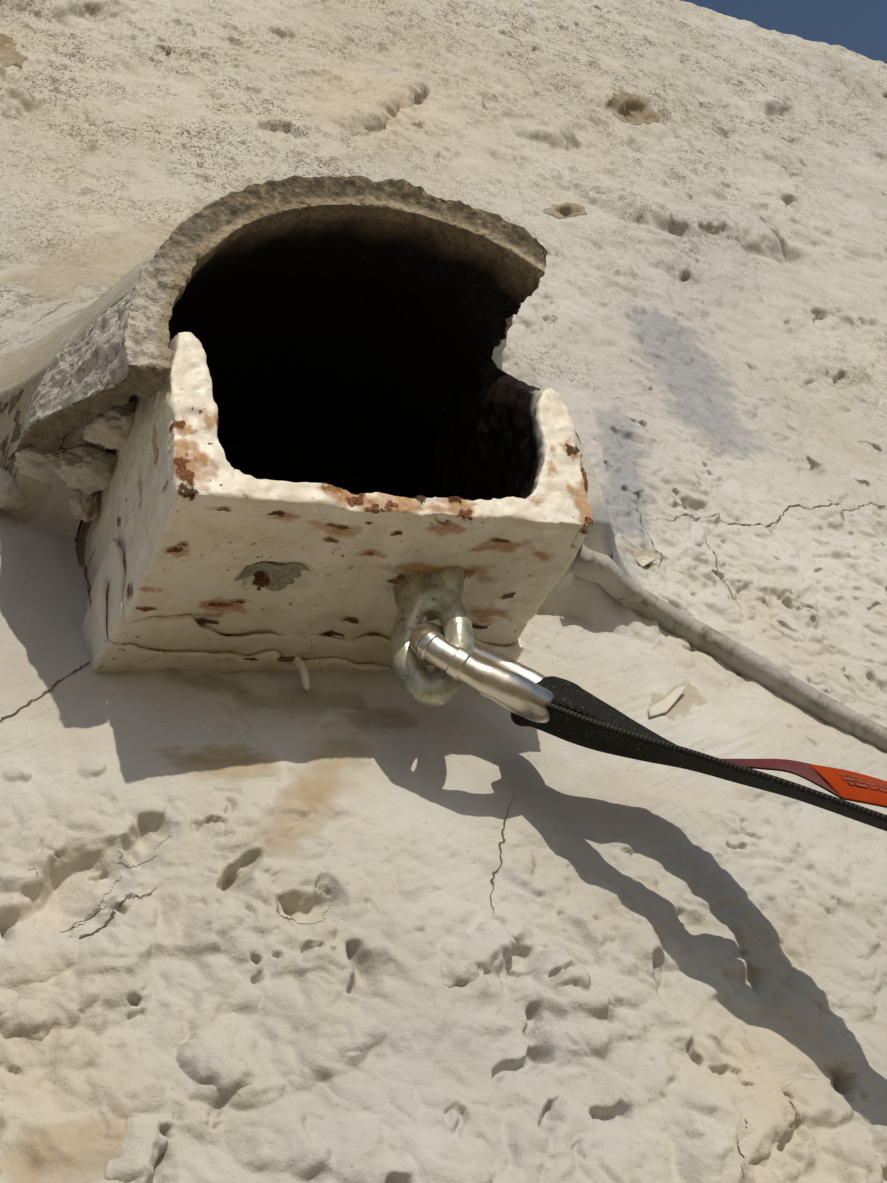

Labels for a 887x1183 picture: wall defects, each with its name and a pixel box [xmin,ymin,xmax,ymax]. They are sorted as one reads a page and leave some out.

spalling [0,33,28,68]
peeling [0,293,116,521]
corrosion [152,416,231,512]
corrosion [312,483,473,543]
corrosion [165,543,188,557]
corrosion [470,539,519,551]
crack [636,502,886,615]
corrosion [127,583,162,612]
corrosion [195,601,252,625]
corrosion [321,618,359,637]
corrosion [472,593,516,630]
crack [0,661,91,721]